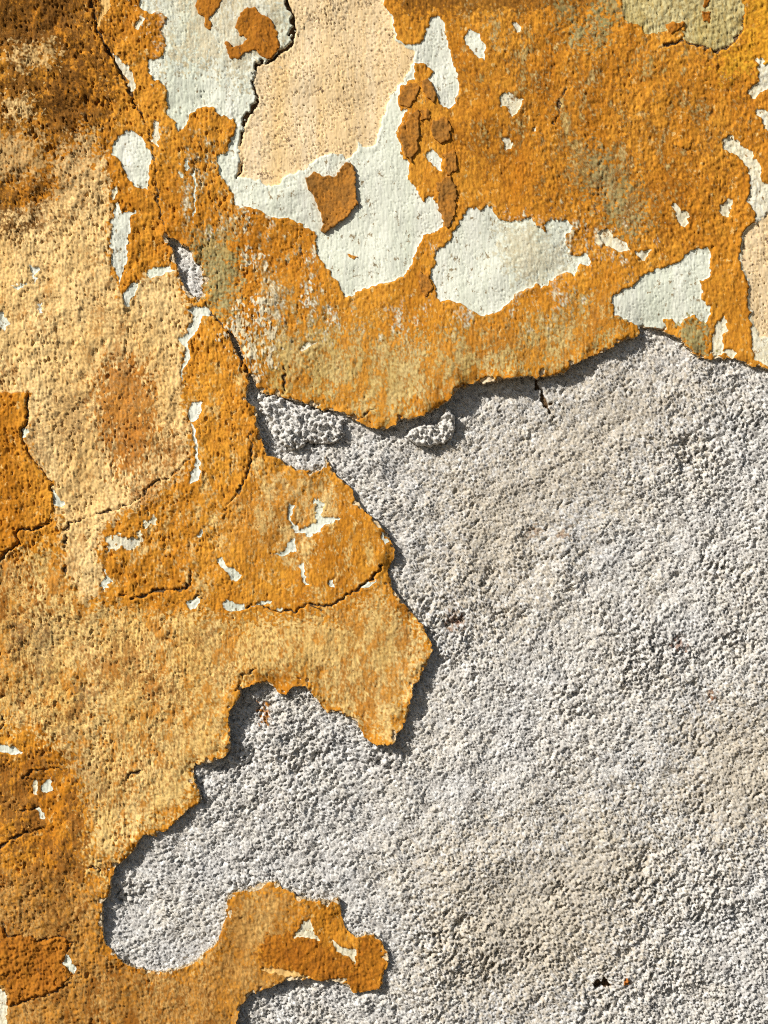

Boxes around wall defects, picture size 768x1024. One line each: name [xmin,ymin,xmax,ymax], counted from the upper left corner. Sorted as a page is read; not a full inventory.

peeling [622,0,745,54]
crack [89,0,164,225]
peeling [748,58,768,130]
peeling [111,130,153,190]
peeling [128,0,660,338]
peeling [723,135,768,366]
crack [534,380,554,420]
crack [0,391,190,575]
crack [223,432,254,519]
peeling [232,456,343,585]
crack [120,575,200,603]
crack [245,565,383,614]